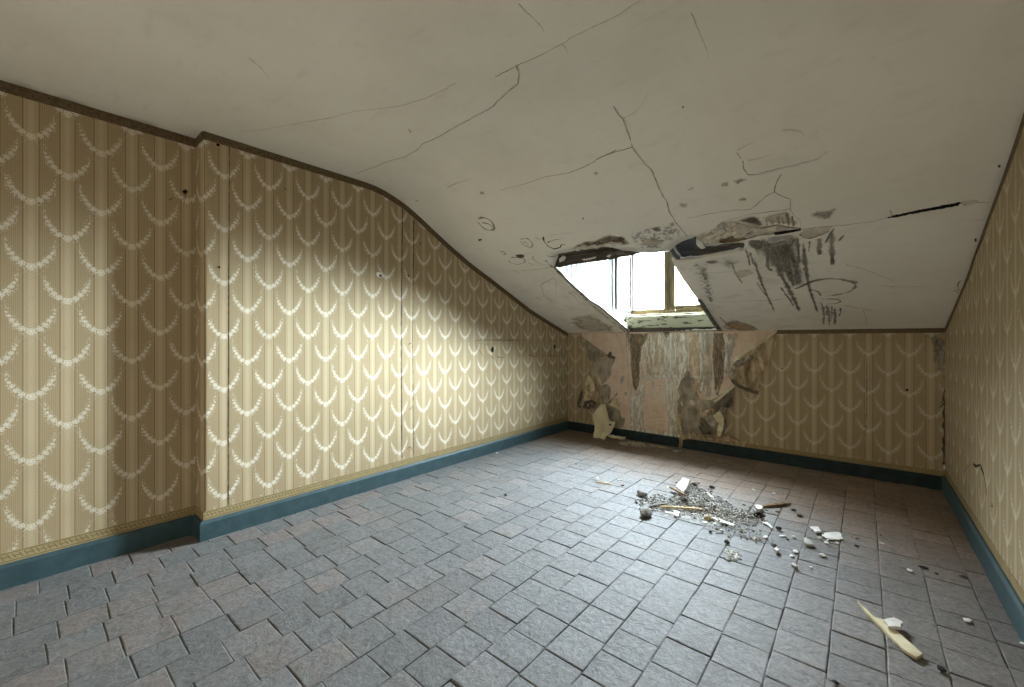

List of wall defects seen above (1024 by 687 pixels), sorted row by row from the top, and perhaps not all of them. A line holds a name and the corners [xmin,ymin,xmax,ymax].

crack [360,1,639,172]
crack [506,96,986,236]
crack [519,233,595,310]
flaking render [559,242,623,262]
flaking render [696,221,833,249]
leakage [695,213,857,324]
flaking render [581,330,775,437]